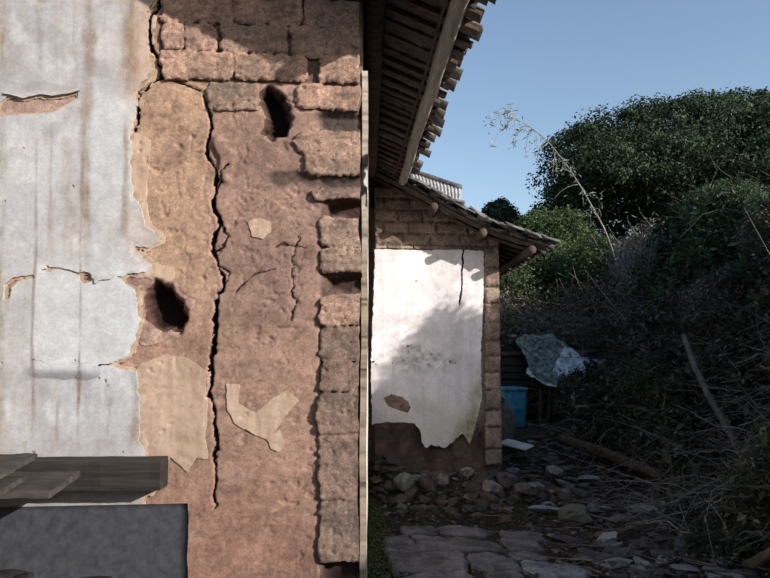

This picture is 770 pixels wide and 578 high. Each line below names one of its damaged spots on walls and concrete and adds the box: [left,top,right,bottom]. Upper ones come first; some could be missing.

peeling [0,88,80,114]
crack [134,0,307,509]
crack [457,249,465,305]
peeling [119,83,362,578]
flaking render [374,394,484,472]